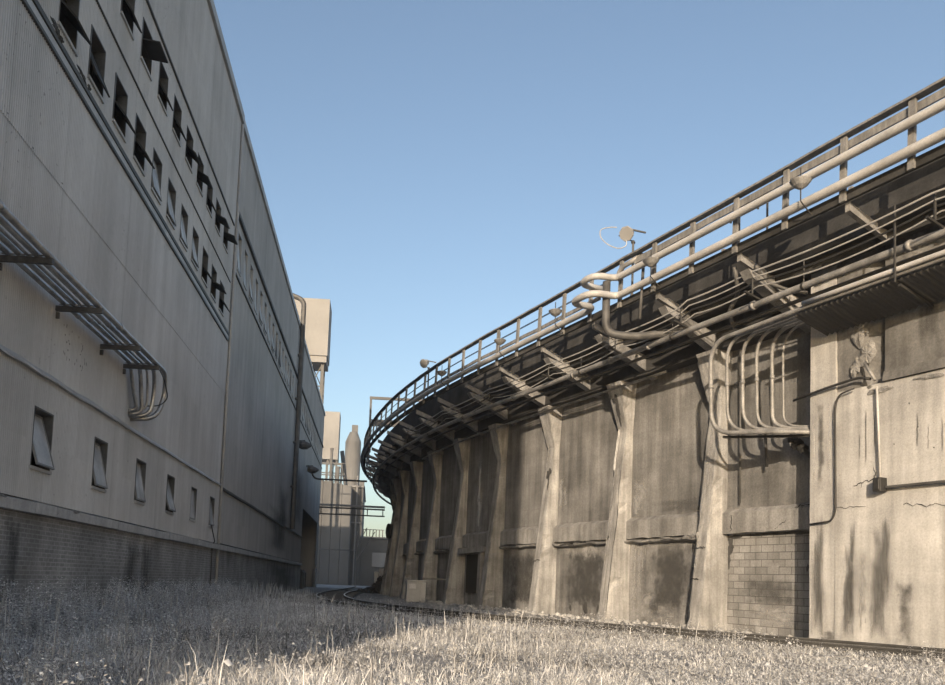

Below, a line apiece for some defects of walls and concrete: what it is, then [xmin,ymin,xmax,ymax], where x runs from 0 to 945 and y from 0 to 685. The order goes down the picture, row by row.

water stain [845,524,889,630]
water stain [901,587,910,634]